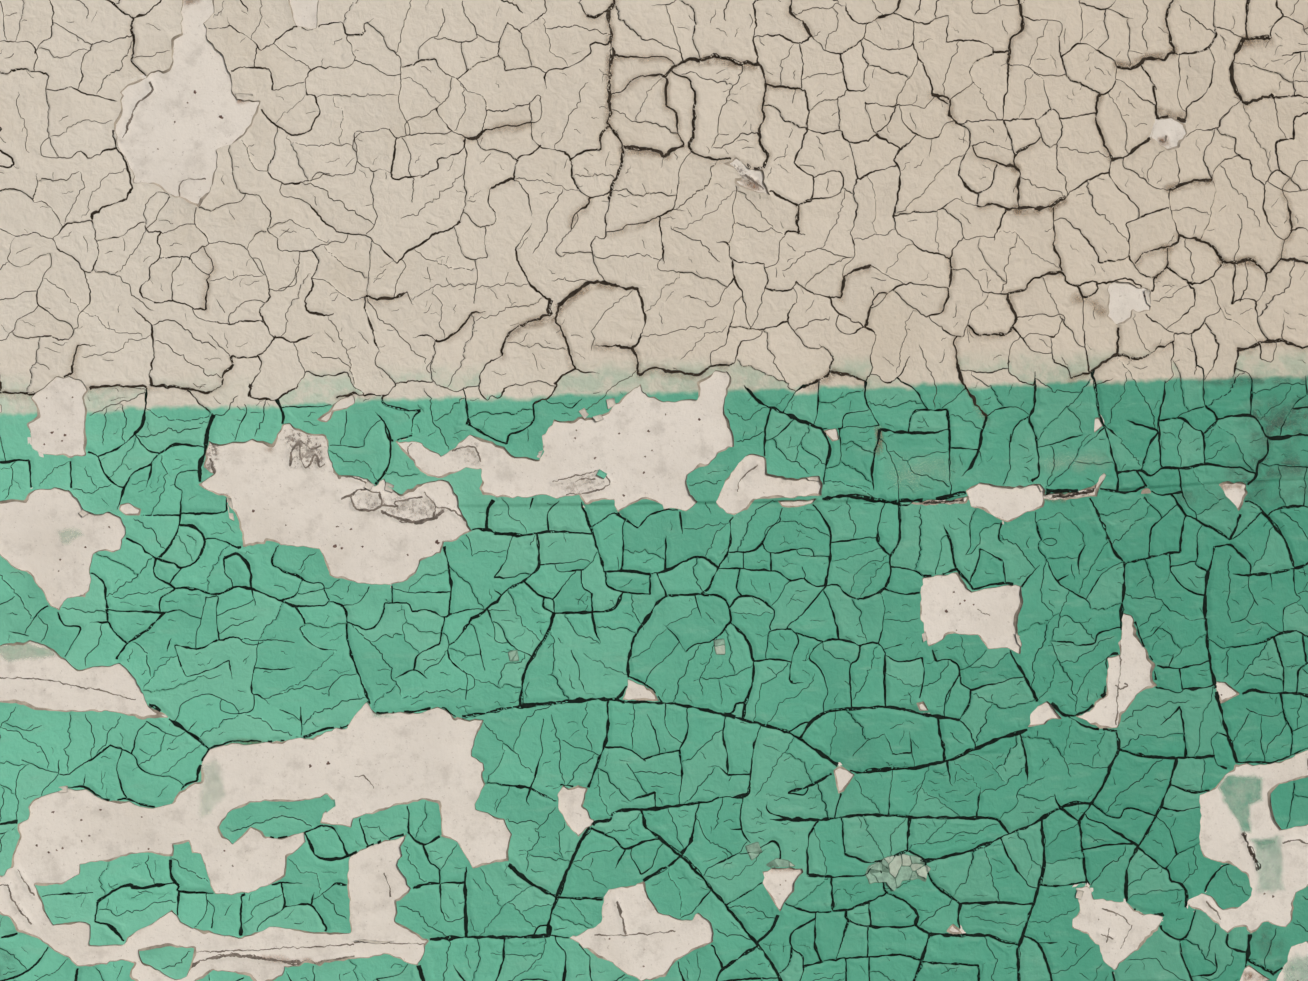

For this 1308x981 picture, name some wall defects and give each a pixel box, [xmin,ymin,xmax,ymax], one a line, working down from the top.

crack [671,227,720,262]
crack [41,461,72,488]
peeling [199,370,822,585]
peeling [0,487,141,610]
crack [0,572,48,642]
peeling [920,572,1023,654]
crack [68,773,110,801]
crack [42,855,347,941]
peeling [0,702,512,981]
peeling [570,881,713,981]
crack [1204,864,1248,895]
peeling [1184,750,1308,933]